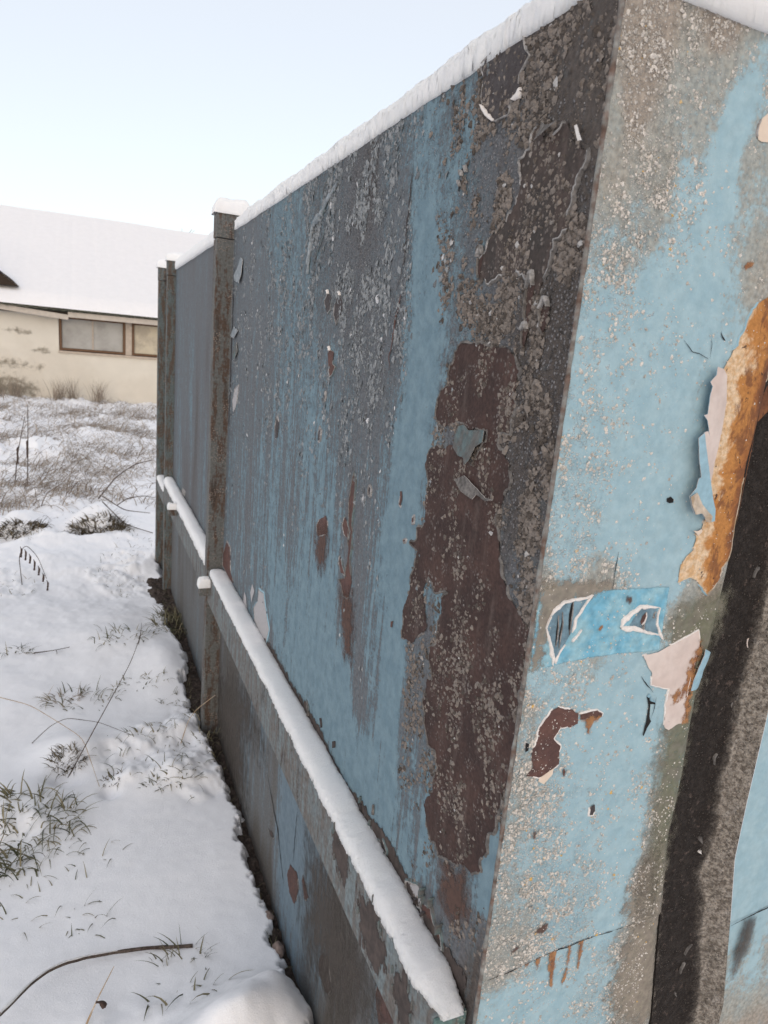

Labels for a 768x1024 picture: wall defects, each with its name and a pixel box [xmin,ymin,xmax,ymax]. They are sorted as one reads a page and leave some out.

rust [676,298,768,596]
rust [314,525,329,571]
peeling [222,36,533,1003]
peeling [390,120,603,876]
rust [338,589,355,667]
peeling [642,629,711,730]
rust [525,940,584,988]